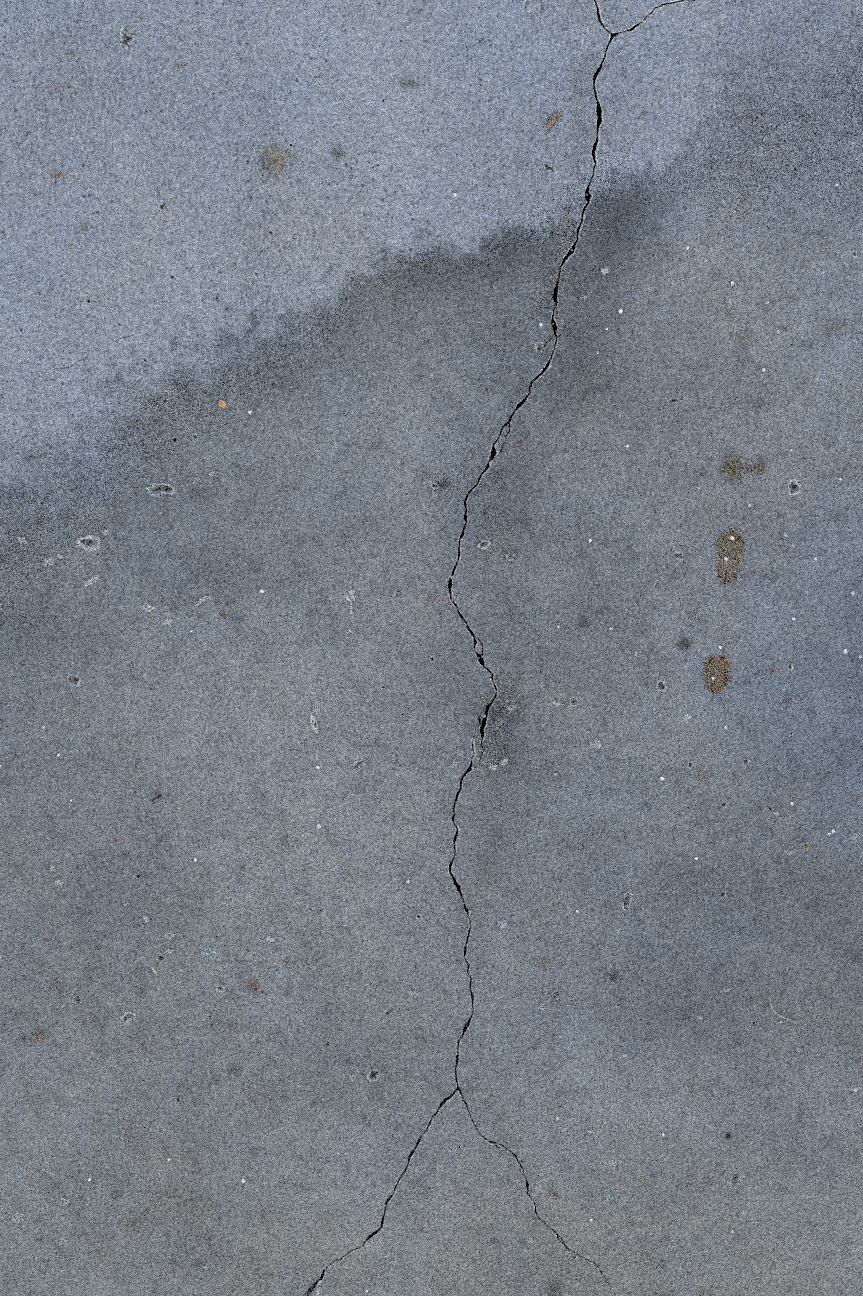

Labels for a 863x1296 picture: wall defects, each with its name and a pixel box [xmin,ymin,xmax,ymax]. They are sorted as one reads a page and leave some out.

damp [717,538,742,581]
crack [304,0,696,1296]
damp [706,657,729,690]